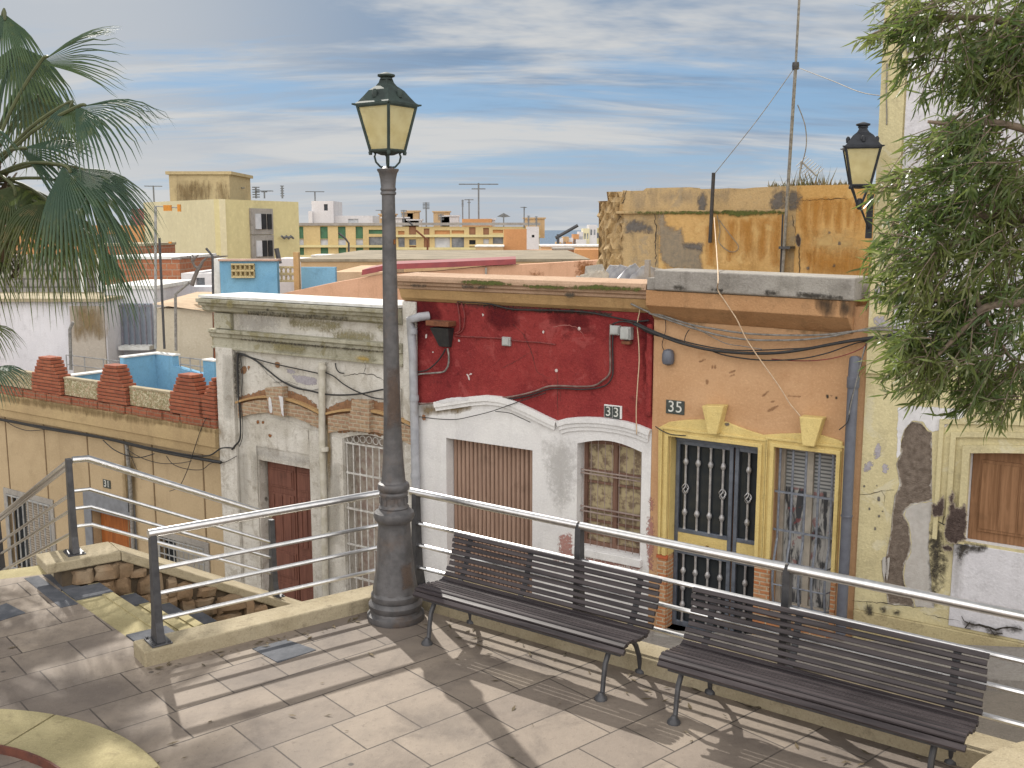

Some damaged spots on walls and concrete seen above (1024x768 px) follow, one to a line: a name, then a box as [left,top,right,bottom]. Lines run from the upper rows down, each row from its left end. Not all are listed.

water stain [770,191,802,210]
spalling [240,362,355,425]
spalling [863,406,968,608]
crack [859,601,1022,636]